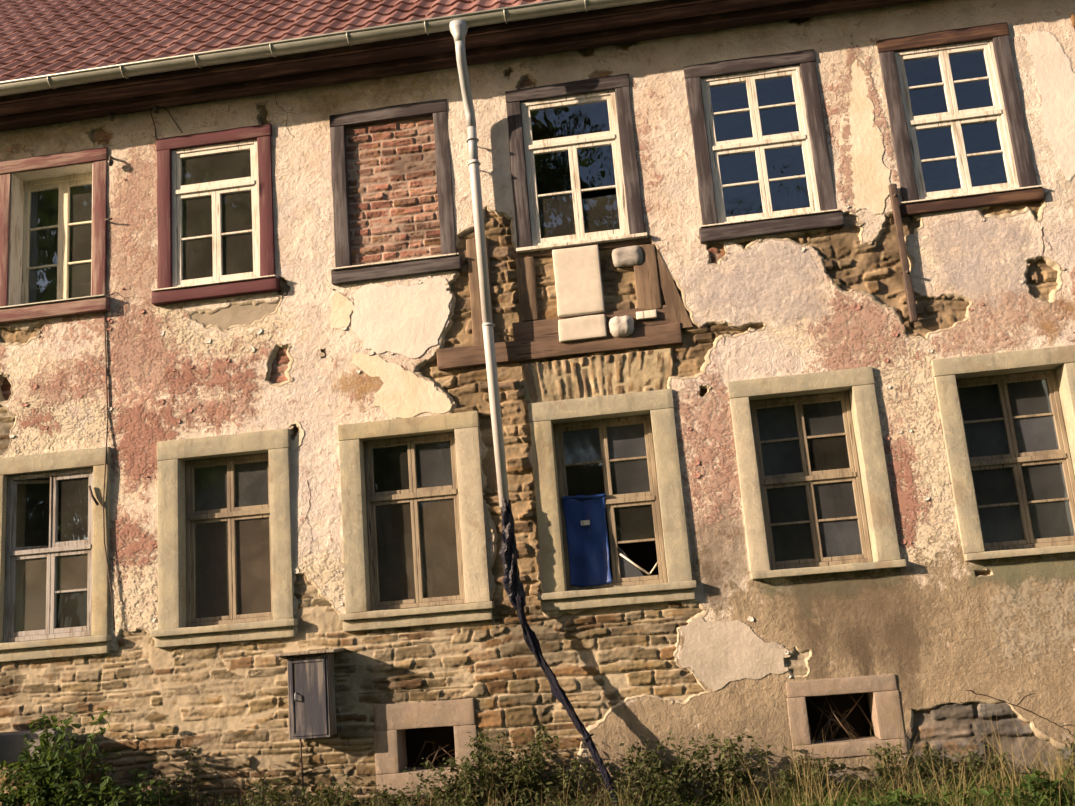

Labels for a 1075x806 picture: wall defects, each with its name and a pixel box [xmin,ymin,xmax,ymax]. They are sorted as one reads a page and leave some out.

peeling [1021,30,1075,182]
flaking render [975,191,1050,222]
peeling [0,143,293,488]
flaking render [706,35,972,574]
flaking render [1024,255,1065,305]
flaking render [0,205,766,806]
flaking render [974,568,993,577]
flaking render [783,644,812,678]
damp [984,575,1075,668]
crack [966,690,1075,737]